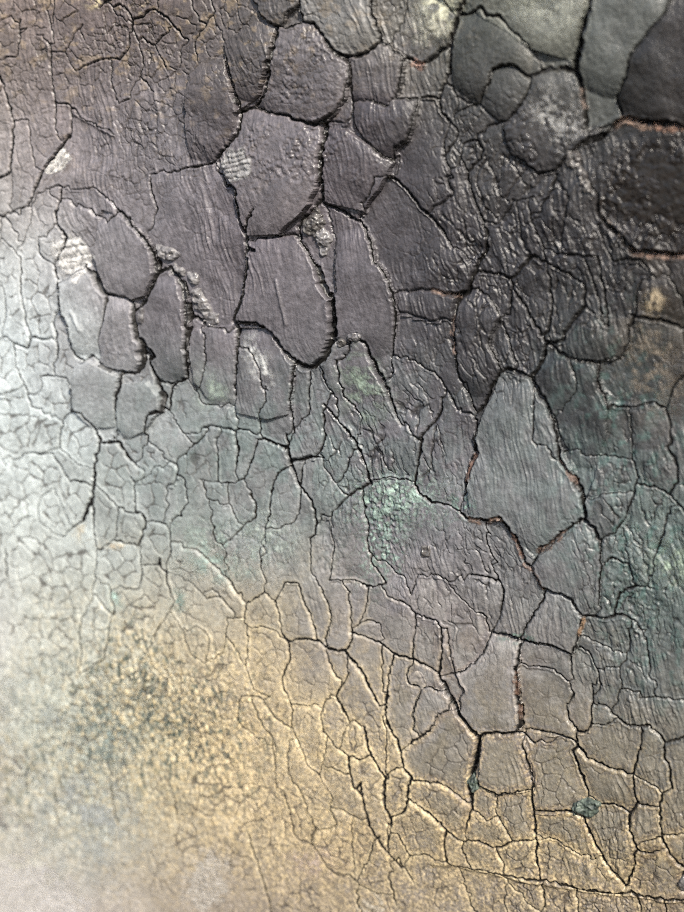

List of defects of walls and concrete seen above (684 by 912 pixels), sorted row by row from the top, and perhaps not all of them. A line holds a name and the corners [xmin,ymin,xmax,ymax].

crack [0,15,27,60]
crack [0,76,35,184]
crack [38,0,216,149]
crack [0,166,86,414]
crack [68,181,162,261]
crack [98,266,207,362]
crack [154,0,684,619]
crack [3,292,684,912]